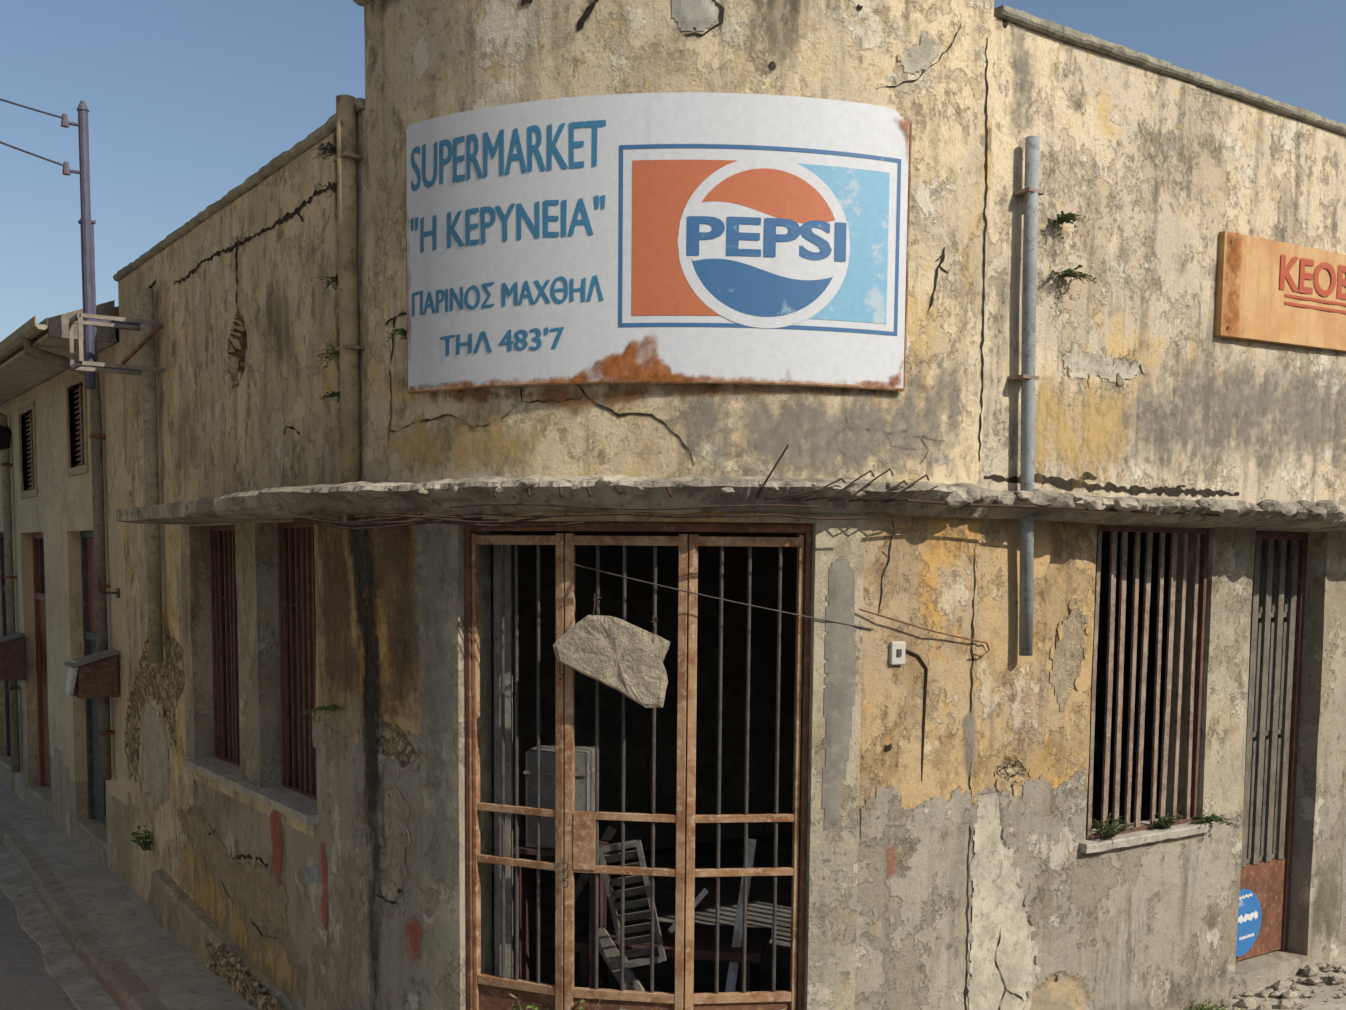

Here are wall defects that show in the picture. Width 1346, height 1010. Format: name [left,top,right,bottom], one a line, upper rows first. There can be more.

crack [576,0,599,31]
crack [683,0,724,37]
water stain [765,0,801,49]
water stain [1012,24,1032,127]
crack [148,187,329,302]
spalling [226,303,247,389]
crack [385,312,694,466]
water stain [1035,359,1346,475]
spalling [123,615,185,785]
water stain [317,513,460,1010]
spalling [376,722,419,905]
peeling [966,759,1093,1010]